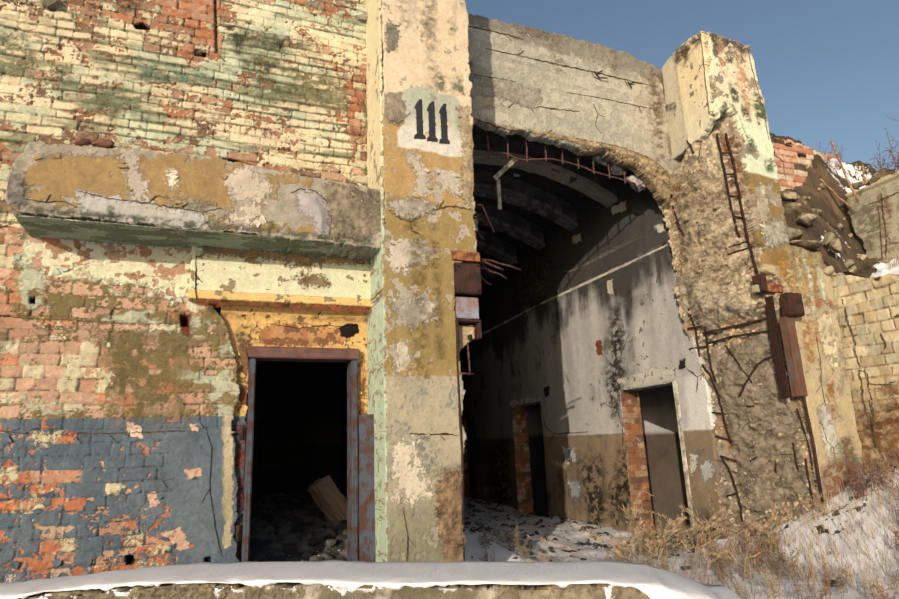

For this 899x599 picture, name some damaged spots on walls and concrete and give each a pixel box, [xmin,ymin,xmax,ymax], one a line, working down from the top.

crack [213,0,236,62]
spalling [384,20,401,53]
crack [468,26,668,172]
spalling [28,137,274,232]
spalling [322,68,673,240]
spalling [654,140,753,296]
peeling [0,222,371,306]
spalling [457,325,475,375]
peeling [0,466,60,527]
rust [234,426,246,512]
spalling [389,433,466,562]
peeling [85,526,190,573]